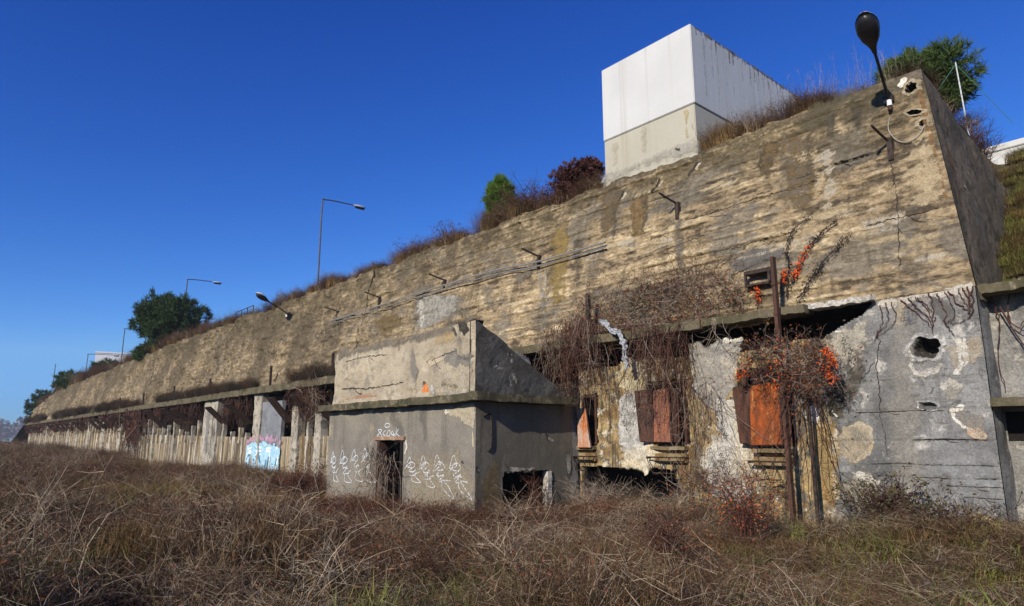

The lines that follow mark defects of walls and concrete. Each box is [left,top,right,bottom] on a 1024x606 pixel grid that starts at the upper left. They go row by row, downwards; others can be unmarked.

water stain [601,143,697,238]
crack [640,153,937,266]
crack [343,382,402,394]
peeling [617,359,649,461]
spalling [903,332,987,441]